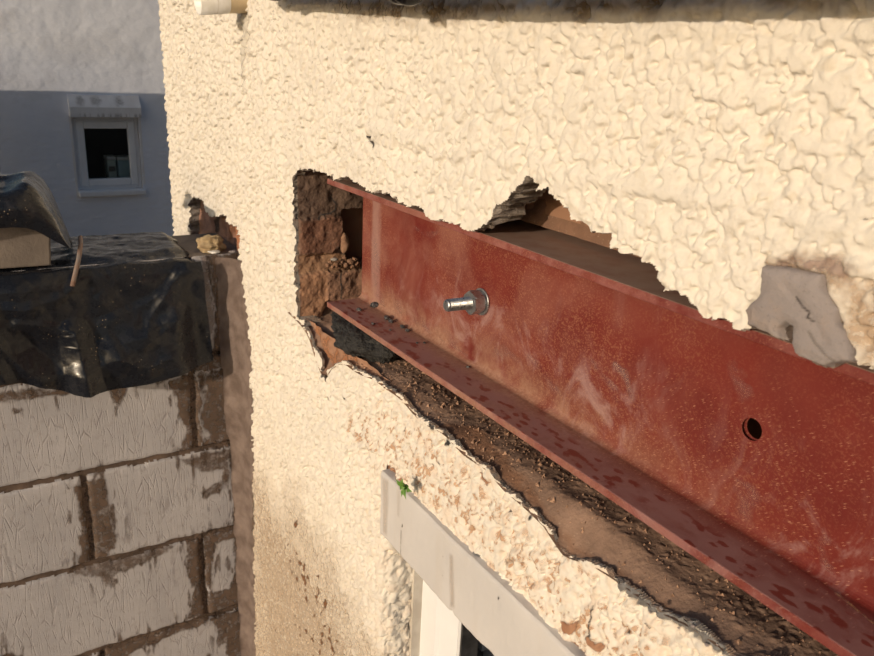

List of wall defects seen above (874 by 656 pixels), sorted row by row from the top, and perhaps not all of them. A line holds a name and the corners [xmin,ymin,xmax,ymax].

flaking render [188,197,240,254]
flaking render [292,168,746,656]